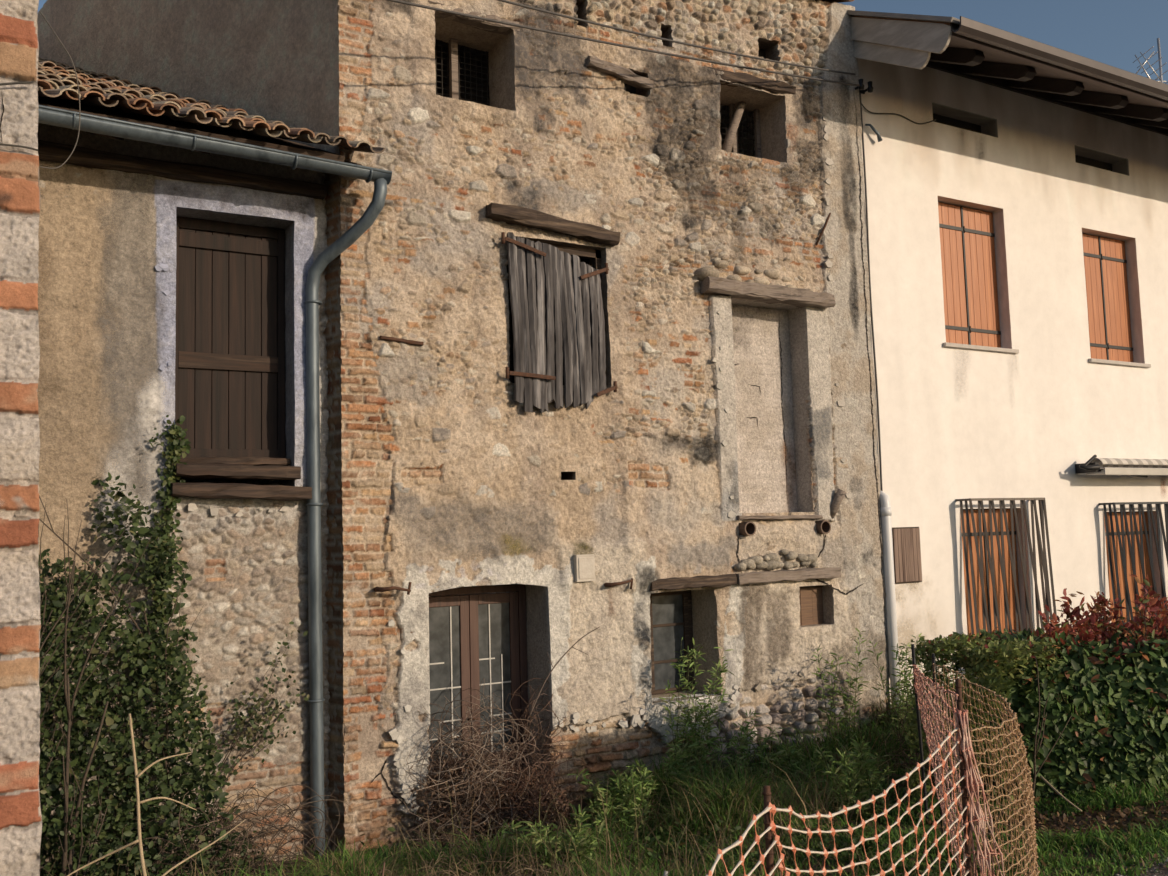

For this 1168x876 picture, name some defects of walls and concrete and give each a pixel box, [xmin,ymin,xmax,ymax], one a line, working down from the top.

damp [634,51,721,231]
damp [843,151,857,248]
damp [850,263,859,326]
damp [693,435,717,464]
spalling [549,671,846,818]